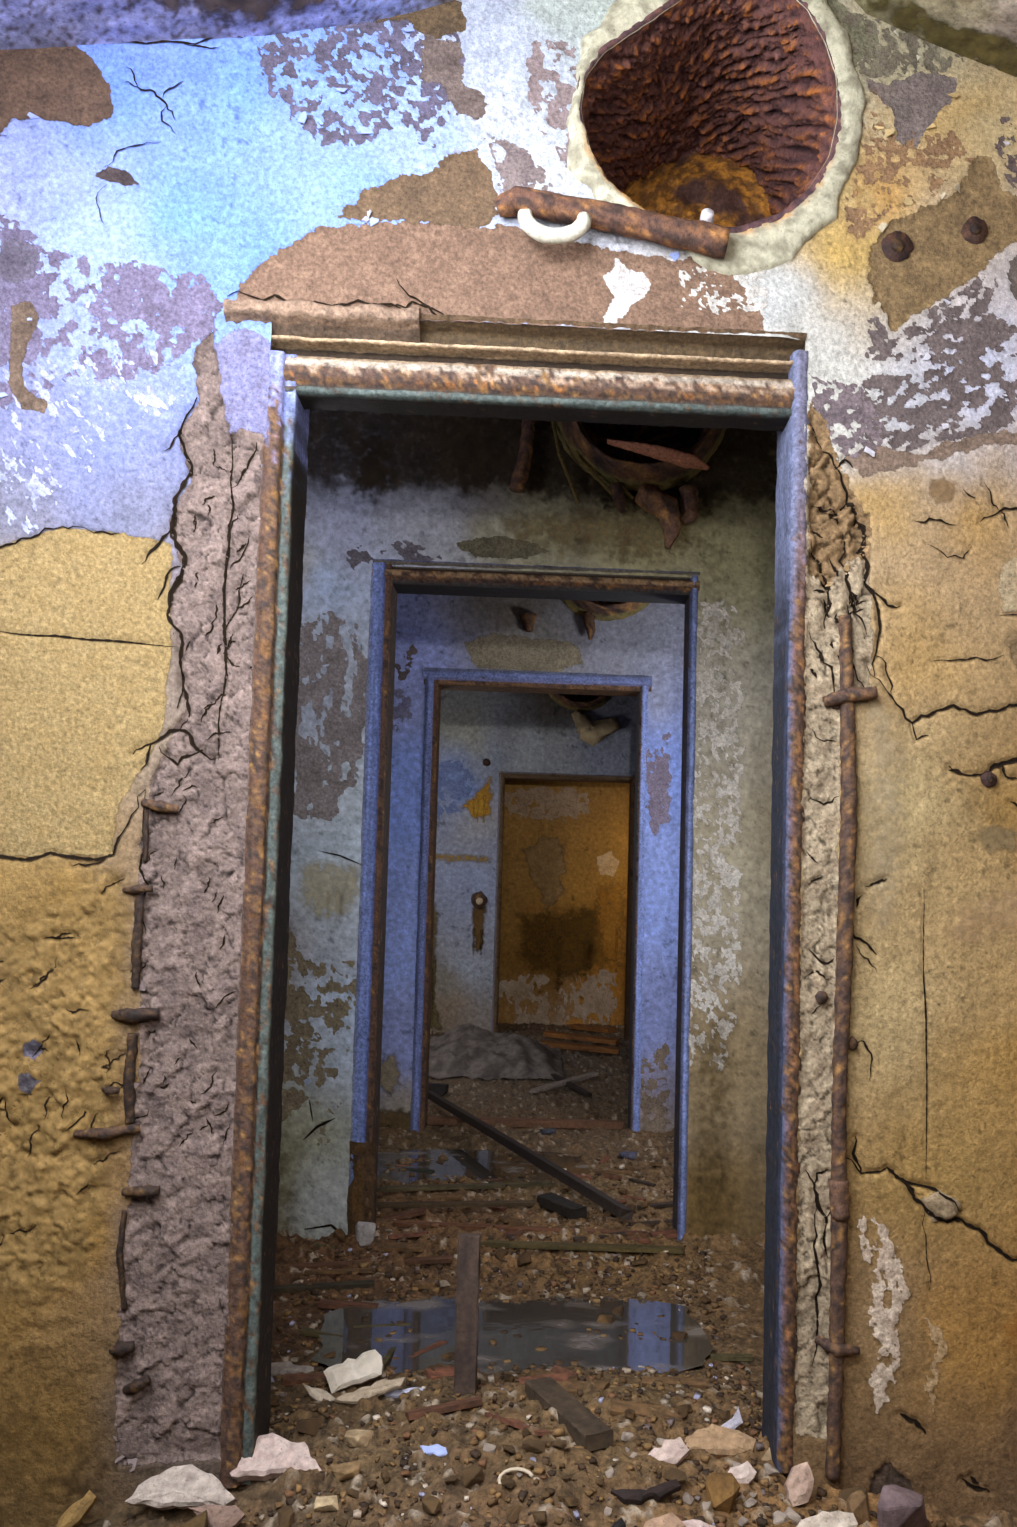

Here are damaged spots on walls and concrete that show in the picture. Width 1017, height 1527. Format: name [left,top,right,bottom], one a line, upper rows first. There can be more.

crack [0,397,257,1008]
flaking render [0,0,770,1472]
flaking render [794,0,1017,1440]
crack [809,424,1017,740]
crack [949,757,1017,807]
crack [0,933,230,1195]
water stain [499,906,618,1026]
crack [805,905,1017,1365]
water stain [857,1216,911,1414]
water stain [924,1317,948,1413]